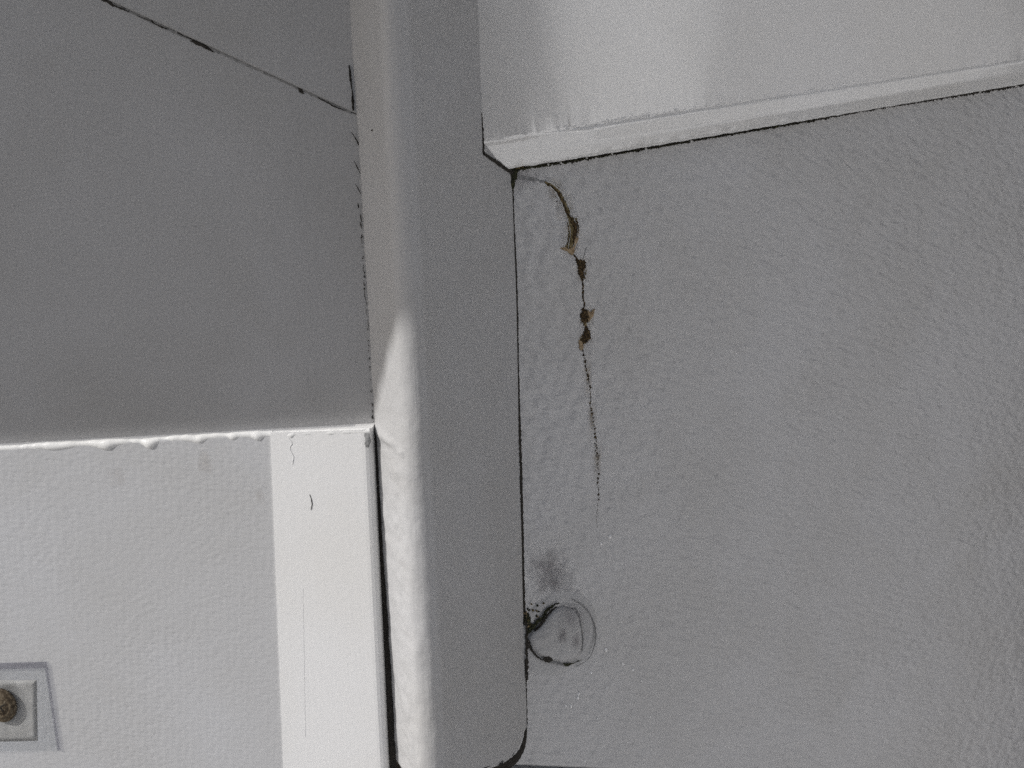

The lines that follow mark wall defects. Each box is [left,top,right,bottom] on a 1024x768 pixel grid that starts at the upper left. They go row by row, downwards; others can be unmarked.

crack [492,84,1024,768]